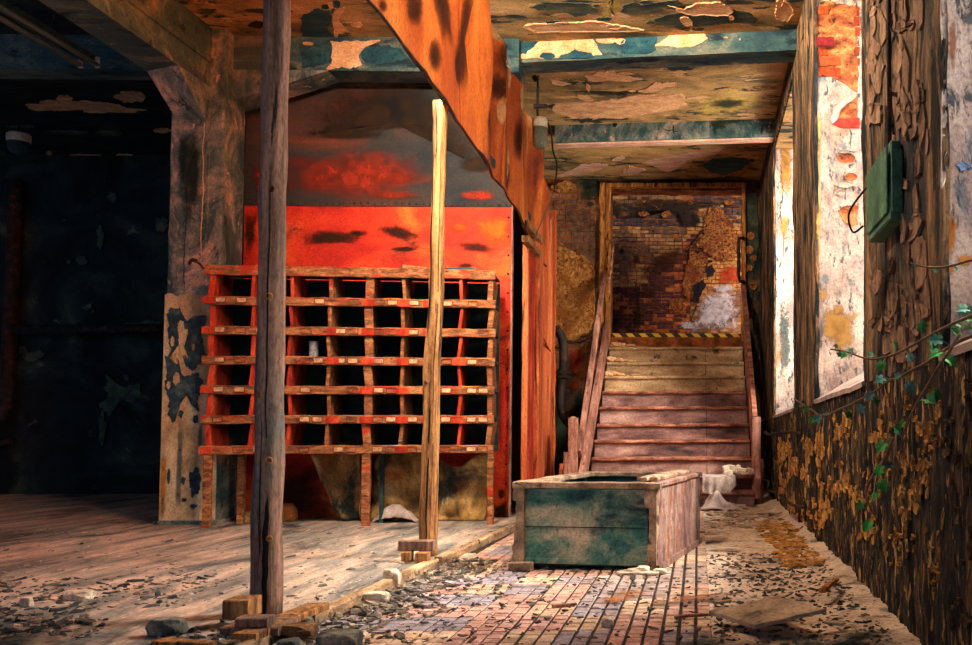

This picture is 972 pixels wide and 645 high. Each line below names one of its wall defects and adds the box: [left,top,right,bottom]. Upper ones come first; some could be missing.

peeling [300,0,407,70]
peeling [521,0,757,59]
peeling [25,91,147,113]
peeling [549,70,688,127]
corrosion [298,156,411,198]
corrosion [464,191,491,199]
peeling [551,149,755,194]
peeling [816,0,972,362]
corrosion [479,219,507,245]
water stain [682,266,738,329]
peeling [125,307,206,423]
peeling [167,467,202,509]